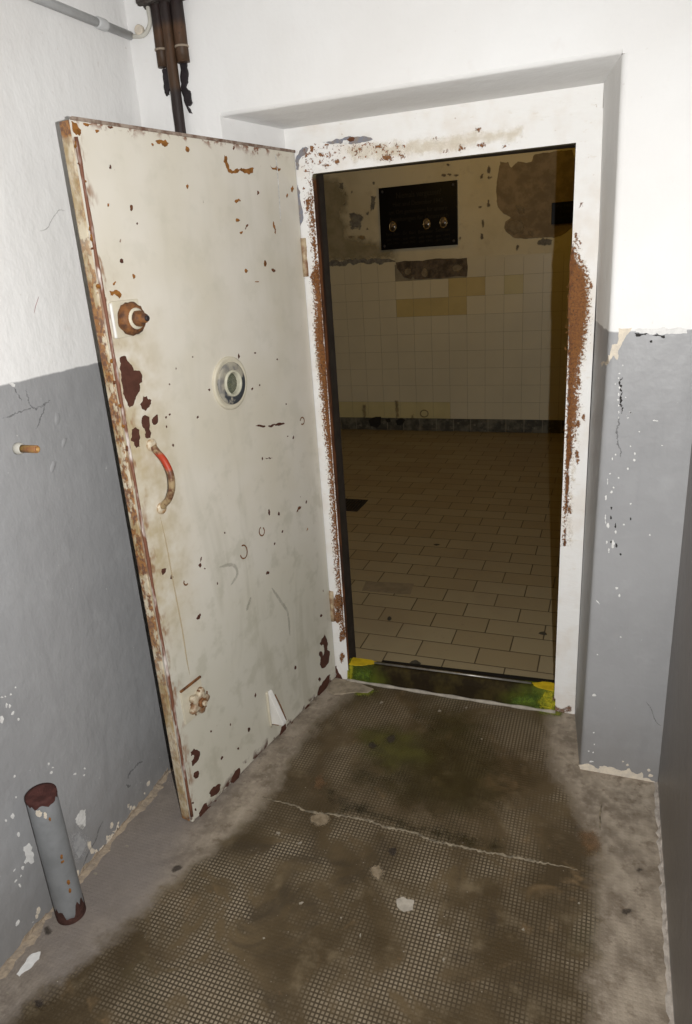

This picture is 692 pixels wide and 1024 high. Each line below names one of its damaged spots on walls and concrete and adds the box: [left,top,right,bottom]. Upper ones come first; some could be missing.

spalling [479,150,575,250]
peeling [396,258,468,279]
rust [110,356,171,451]
rust [286,142,406,709]
rust [560,232,593,546]
crack [617,365,629,419]
peeling [601,327,687,366]
spalling [605,446,636,556]
spalling [13,832,34,887]
spalling [72,766,174,884]
crack [263,796,577,870]
spalling [578,732,674,1024]